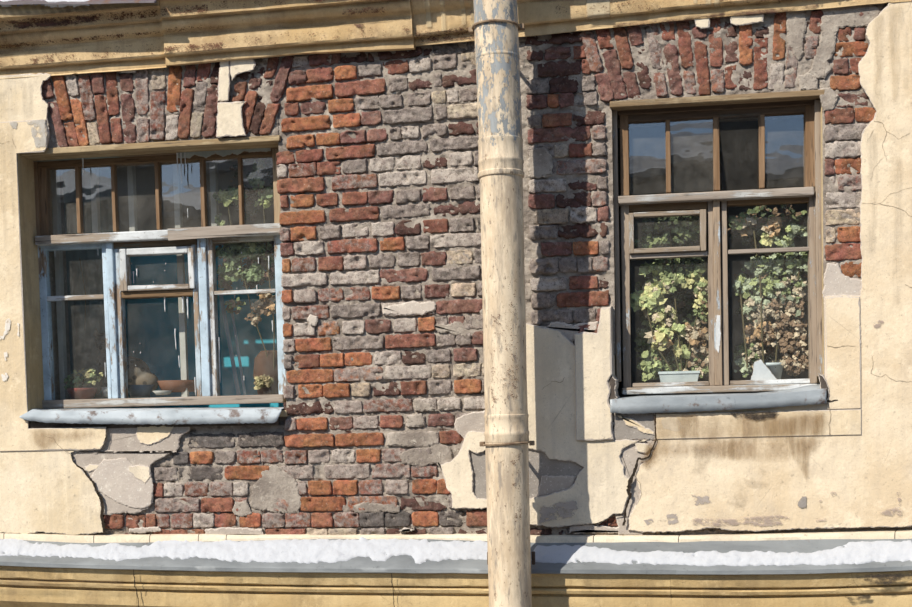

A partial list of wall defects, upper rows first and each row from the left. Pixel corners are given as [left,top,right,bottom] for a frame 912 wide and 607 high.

rust [0,1,228,30]
rust [0,7,391,66]
rust [403,11,475,42]
rust [575,0,791,27]
spalling [519,4,885,355]
spalling [10,41,487,539]
damp [731,411,778,420]
crack [595,415,657,526]
spalling [529,413,912,538]